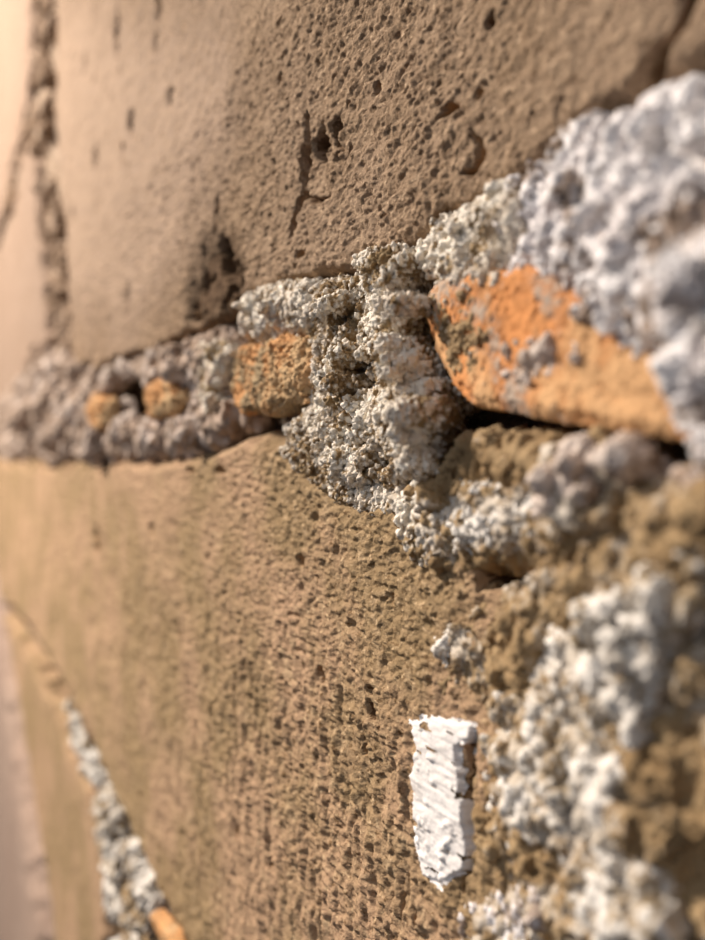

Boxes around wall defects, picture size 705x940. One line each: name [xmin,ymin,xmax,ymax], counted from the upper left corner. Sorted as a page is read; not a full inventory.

spalling [16,0,59,169]
spalling [438,102,460,119]
crack [309,120,345,166]
spalling [465,131,487,176]
crack [310,196,331,204]
spalling [0,175,275,474]
spalling [485,573,529,588]
peeling [409,714,477,892]